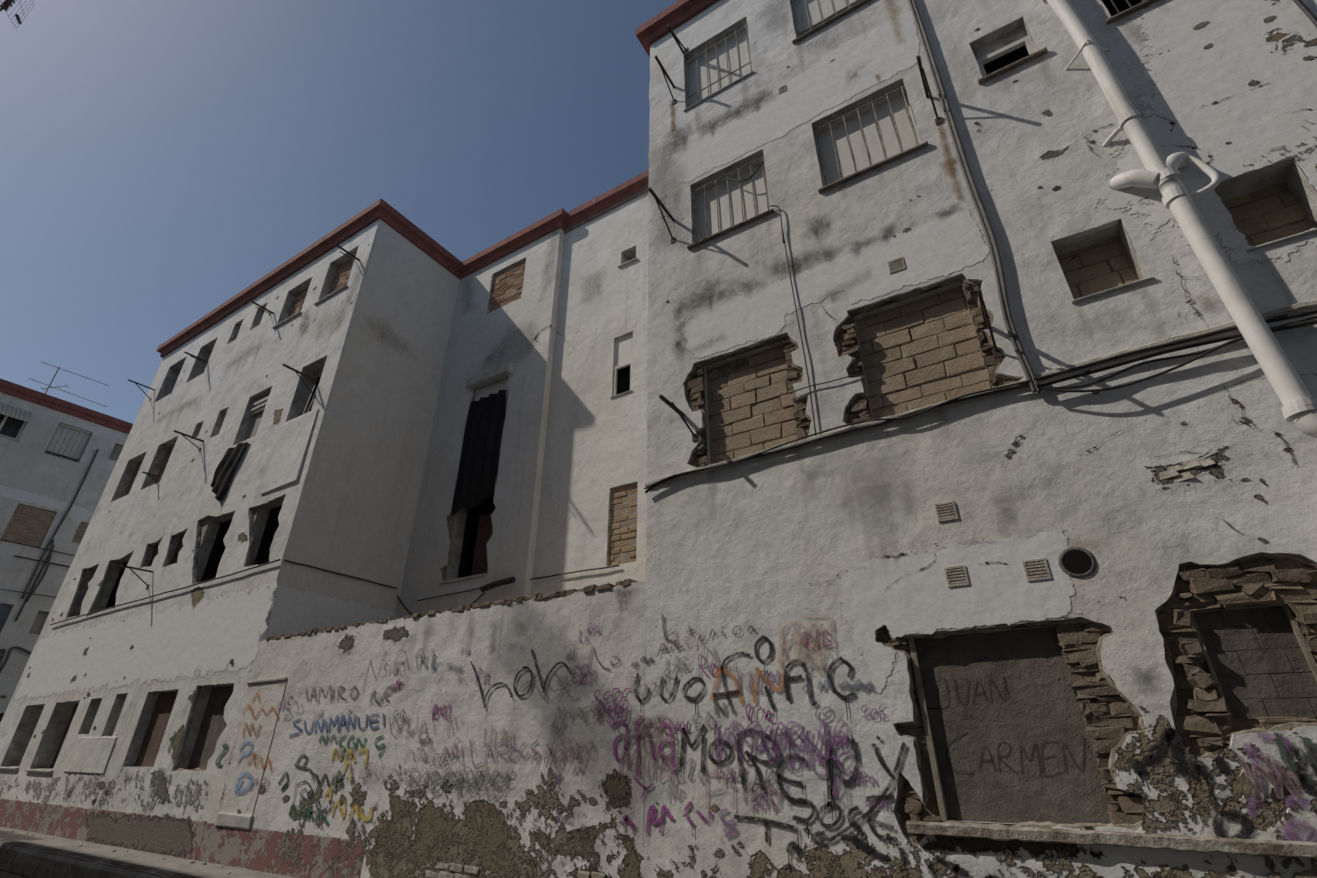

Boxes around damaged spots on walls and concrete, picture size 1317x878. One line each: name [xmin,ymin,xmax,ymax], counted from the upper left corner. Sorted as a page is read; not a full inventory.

spalling [1262,0,1317,61]
peeling [1243,136,1317,171]
spalling [686,366,709,468]
spalling [781,337,811,441]
spalling [836,314,871,426]
crack [1223,375,1297,465]
crack [1155,451,1223,476]
peeling [1137,443,1268,504]
spalling [380,621,414,647]
spalling [878,629,911,655]
spalling [896,715,926,744]
spalling [1056,558,1317,841]